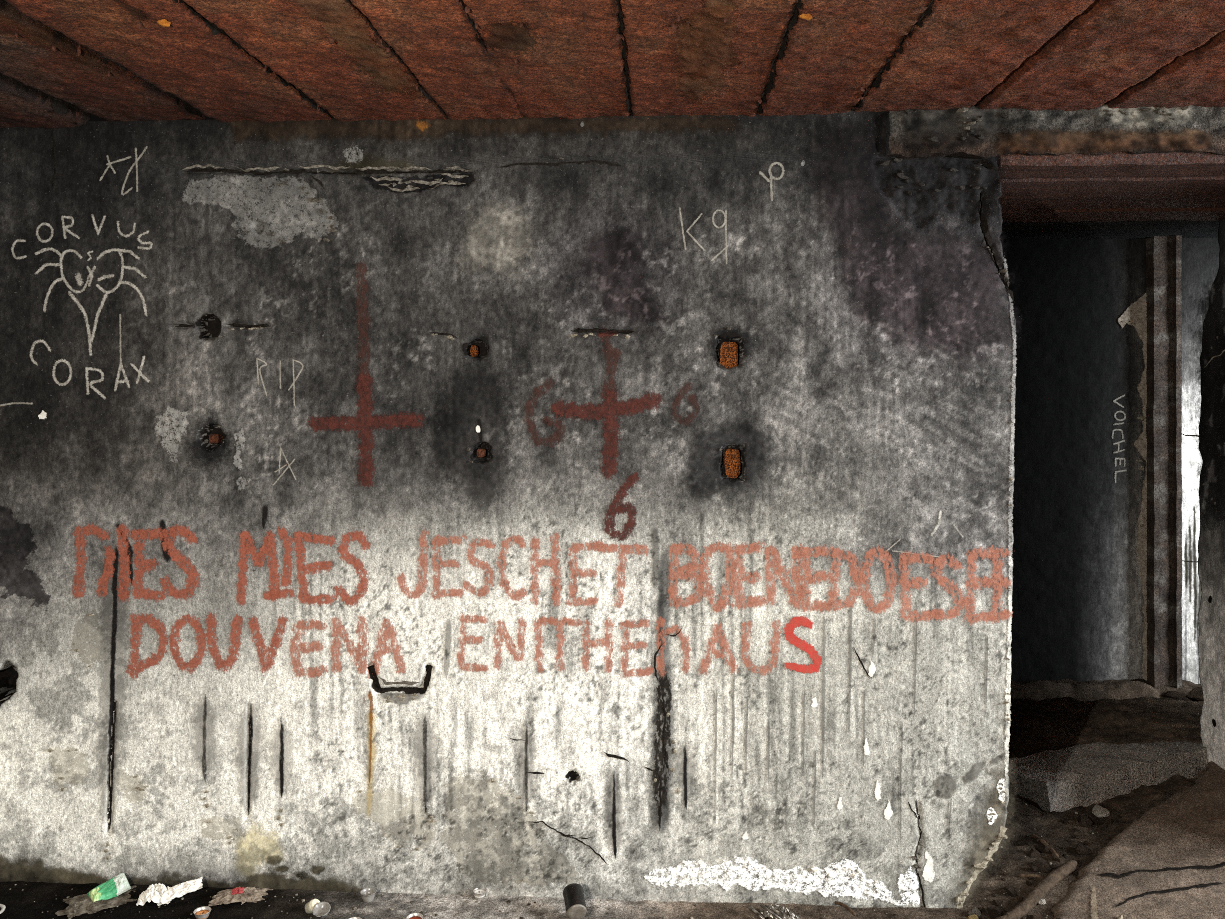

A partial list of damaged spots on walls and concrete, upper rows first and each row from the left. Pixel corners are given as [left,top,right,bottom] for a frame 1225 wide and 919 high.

crack [181,157,621,189]
peeling [182,174,339,248]
leakage [651,529,695,831]
leakage [644,856,920,906]
crack [904,799,925,907]